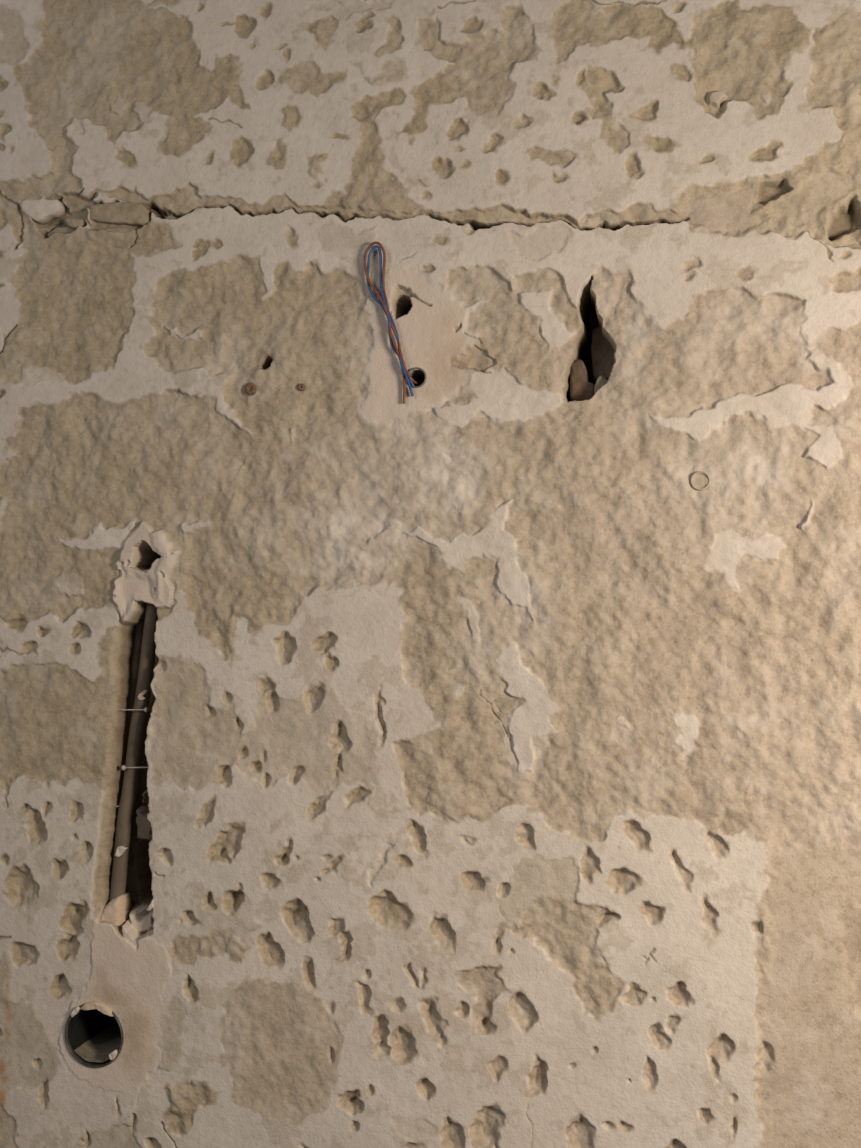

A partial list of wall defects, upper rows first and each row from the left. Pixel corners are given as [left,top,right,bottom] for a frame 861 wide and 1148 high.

spalling [218,2,274,50]
spalling [229,137,255,169]
spalling [255,0,861,294]
spalling [0,0,251,399]
crack [0,183,690,250]
crack [808,232,835,262]
spalling [0,239,861,1148]